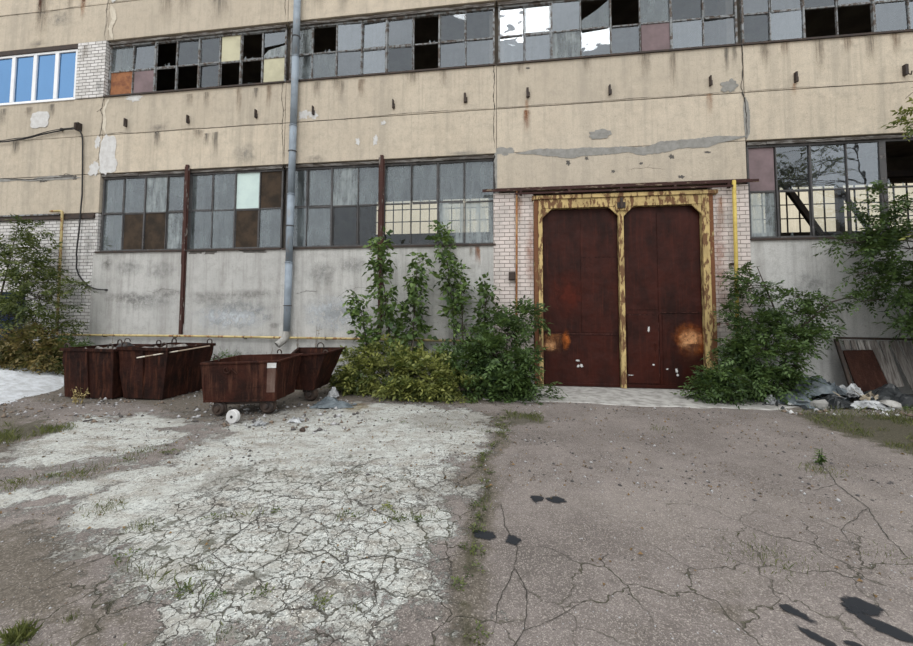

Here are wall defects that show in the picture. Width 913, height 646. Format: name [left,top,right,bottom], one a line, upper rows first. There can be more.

peeling [0,97,118,182]
rust [678,329,702,356]
crack [820,464,911,560]
crack [250,549,458,573]
crack [493,505,527,646]